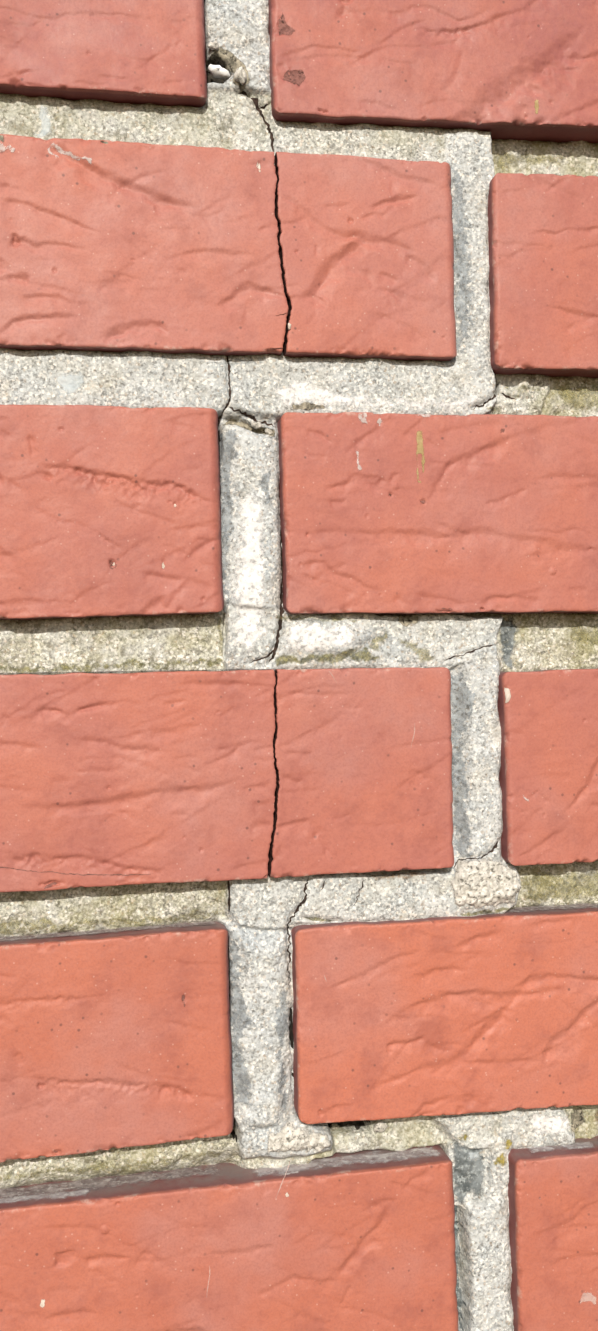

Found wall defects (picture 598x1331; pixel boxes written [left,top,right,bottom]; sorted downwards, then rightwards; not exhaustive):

crack [238,91,292,356]
crack [221,356,274,427]